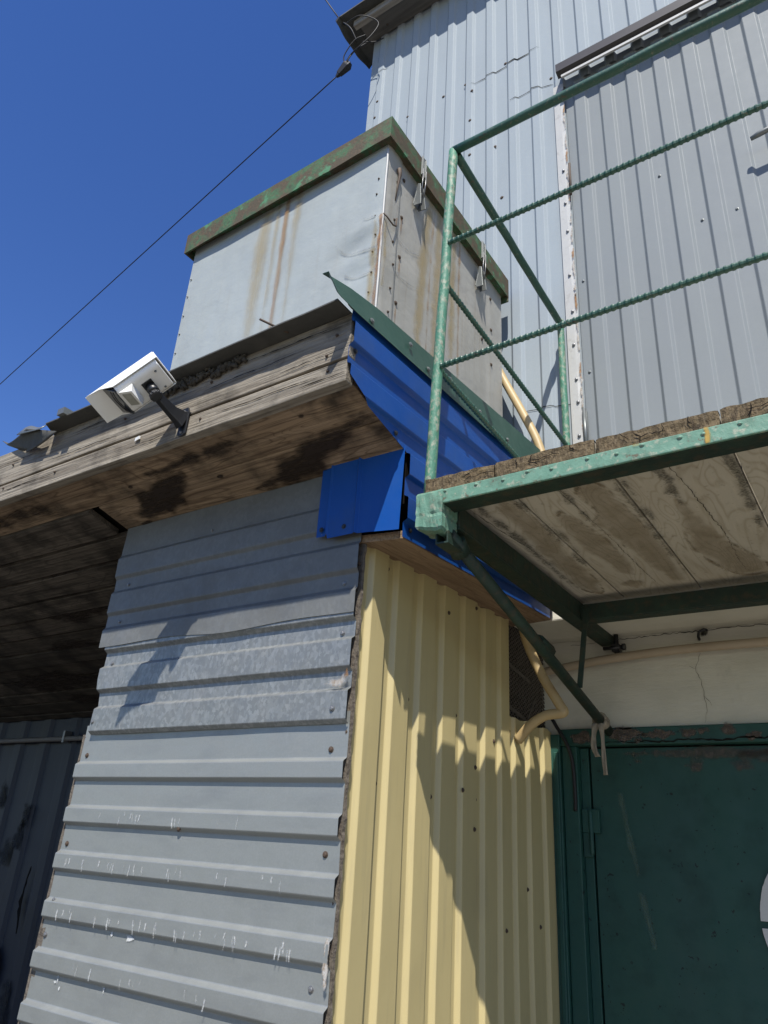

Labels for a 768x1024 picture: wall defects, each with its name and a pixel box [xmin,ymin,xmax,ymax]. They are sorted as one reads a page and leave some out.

water stain [135,442,233,525]
water stain [256,415,370,489]
crack [599,624,768,744]